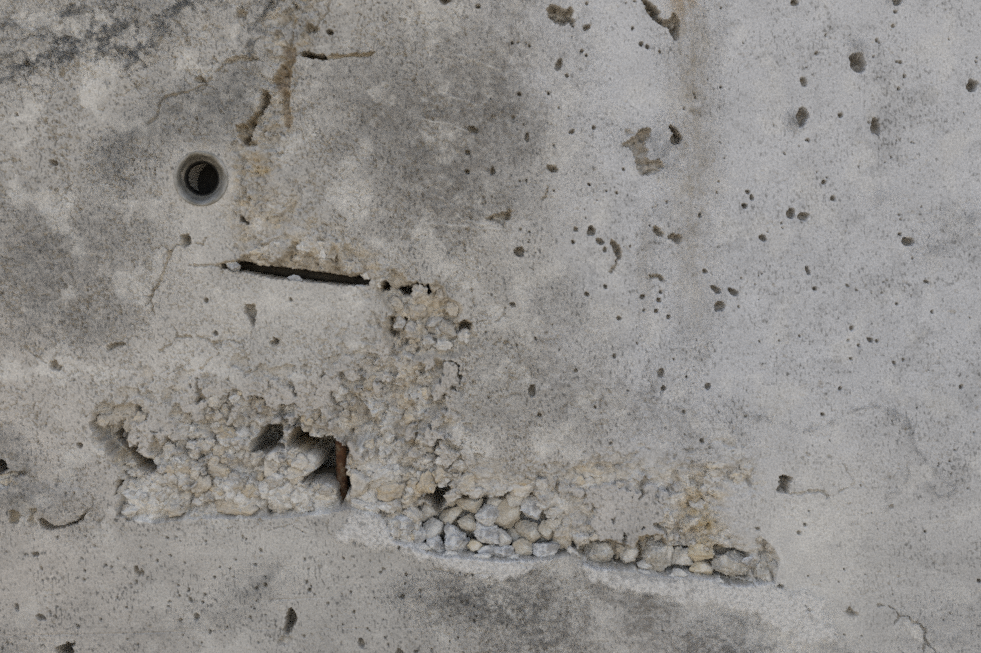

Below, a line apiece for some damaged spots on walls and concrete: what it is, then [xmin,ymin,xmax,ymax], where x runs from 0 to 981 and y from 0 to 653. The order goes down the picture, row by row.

spalling [179,233,207,249]
spalling [215,239,432,296]
spalling [607,238,623,274]
spalling [652,225,682,246]
spalling [243,303,258,329]
spalling [387,316,409,338]
spalling [458,320,473,331]
spalling [91,400,157,476]
spalling [0,459,27,491]
spalling [248,423,352,508]
spalling [422,485,451,509]
crack [877,603,936,652]